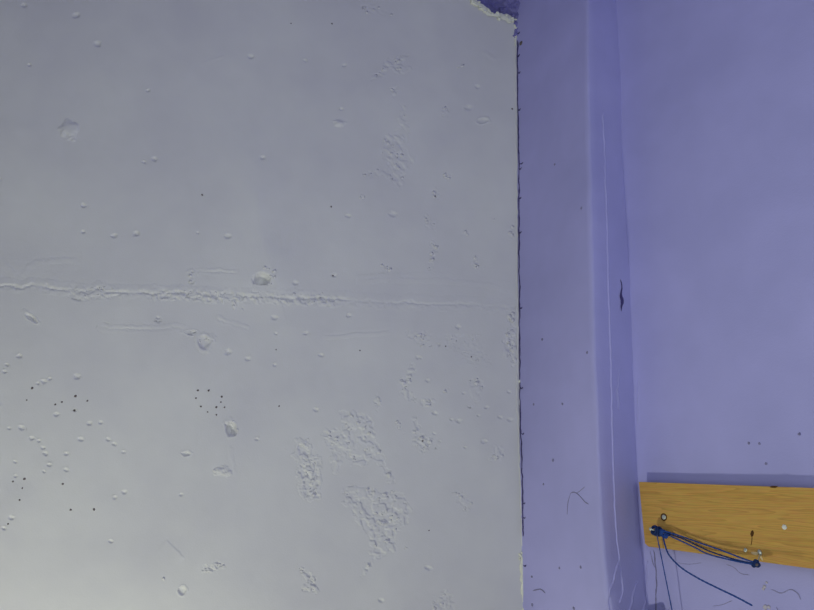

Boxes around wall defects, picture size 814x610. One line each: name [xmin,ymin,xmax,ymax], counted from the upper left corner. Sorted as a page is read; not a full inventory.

flaking render [470,0,520,46]
crack [516,32,525,535]